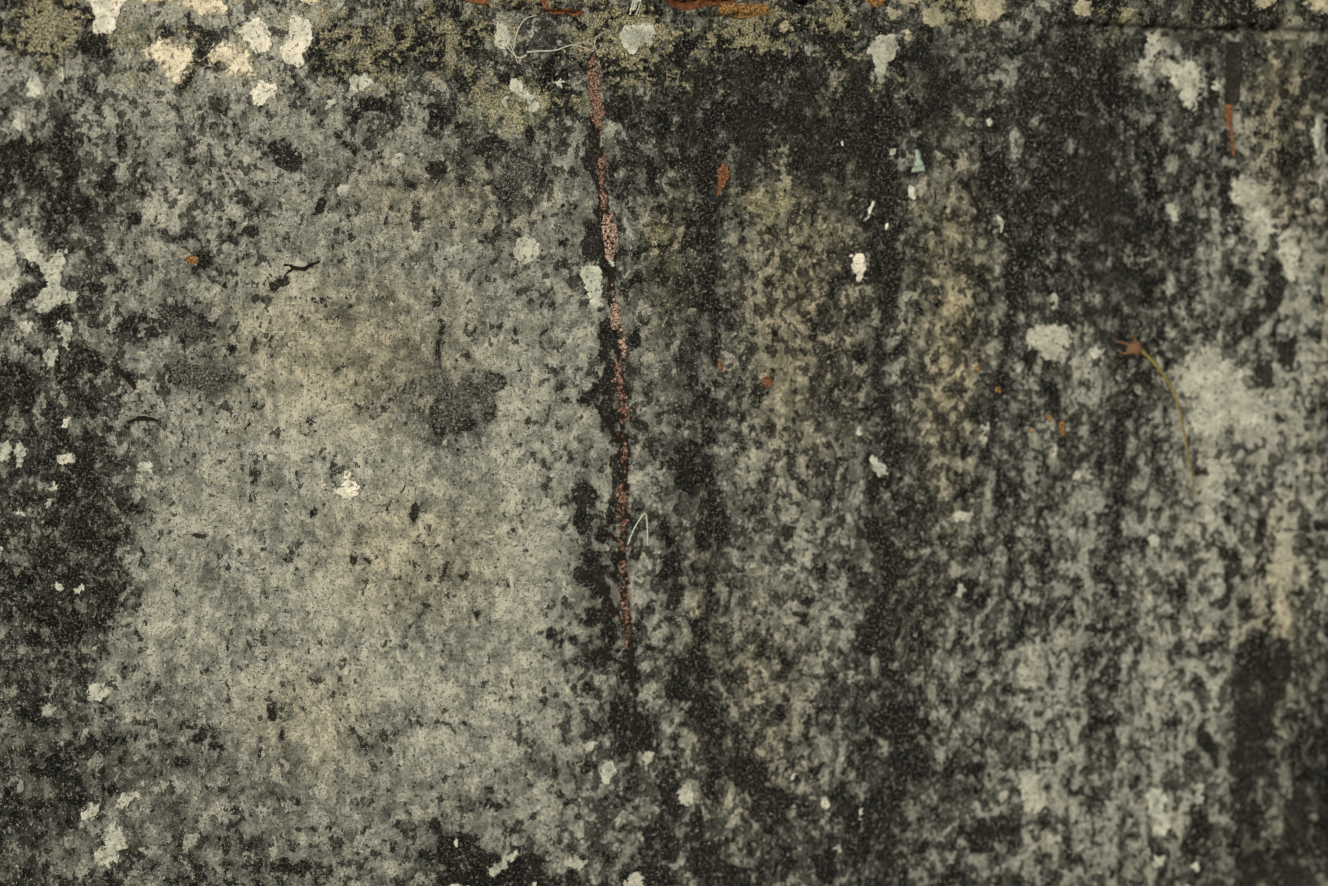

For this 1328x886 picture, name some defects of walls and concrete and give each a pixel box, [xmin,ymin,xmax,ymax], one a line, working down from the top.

crack [582,53,639,743]
corrosion [719,3,770,18]
damp [678,57,922,886]
damp [920,53,952,165]
damp [981,24,1135,473]
damp [1234,647,1328,886]